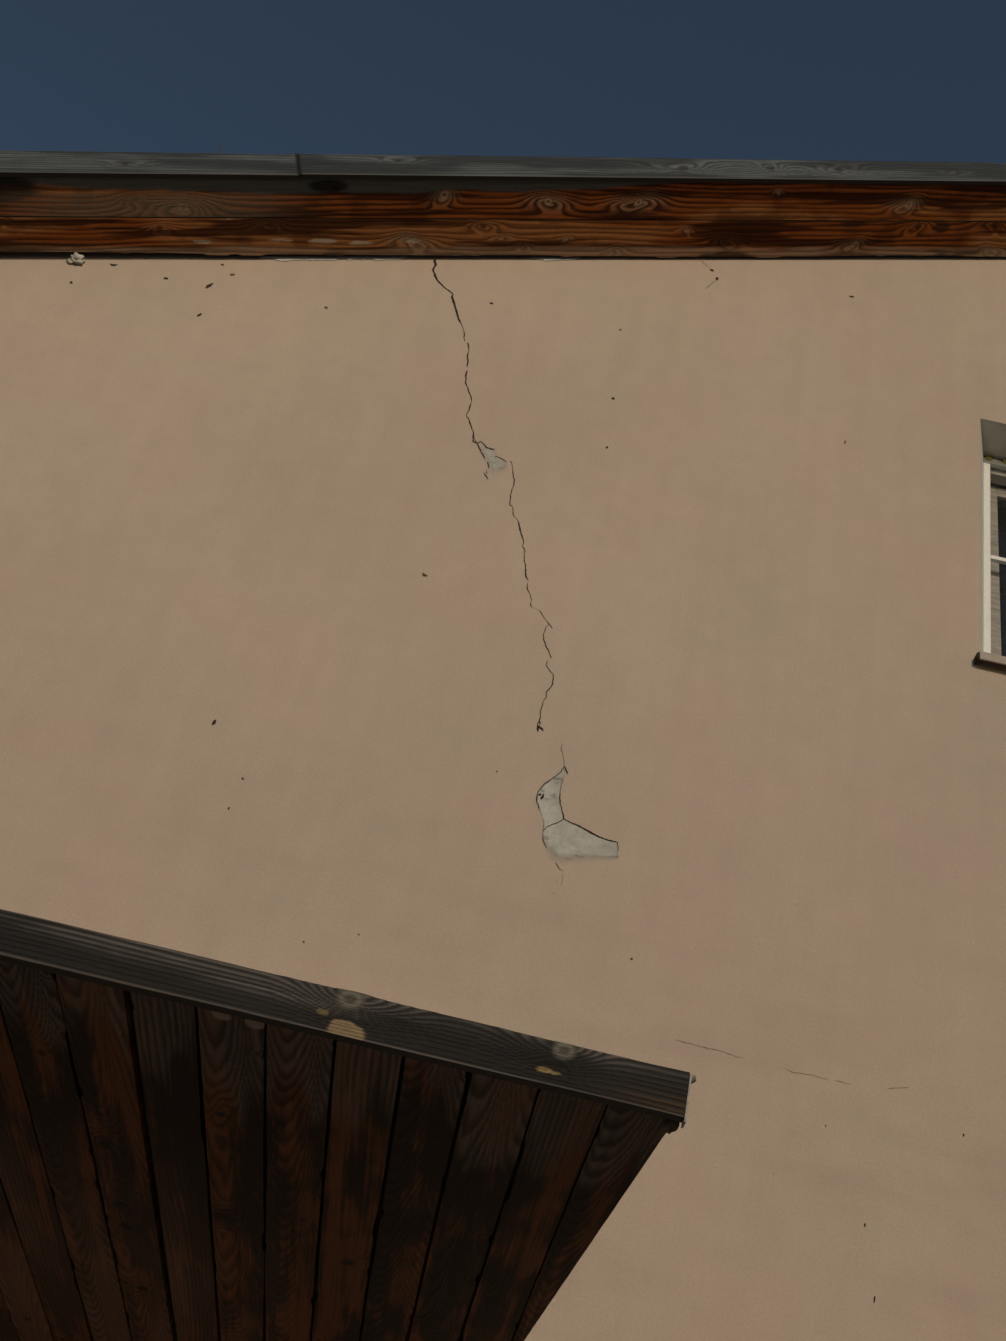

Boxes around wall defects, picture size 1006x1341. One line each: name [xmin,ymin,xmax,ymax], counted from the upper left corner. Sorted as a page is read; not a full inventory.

crack [432,259,565,766]
peeling [536,766,619,858]